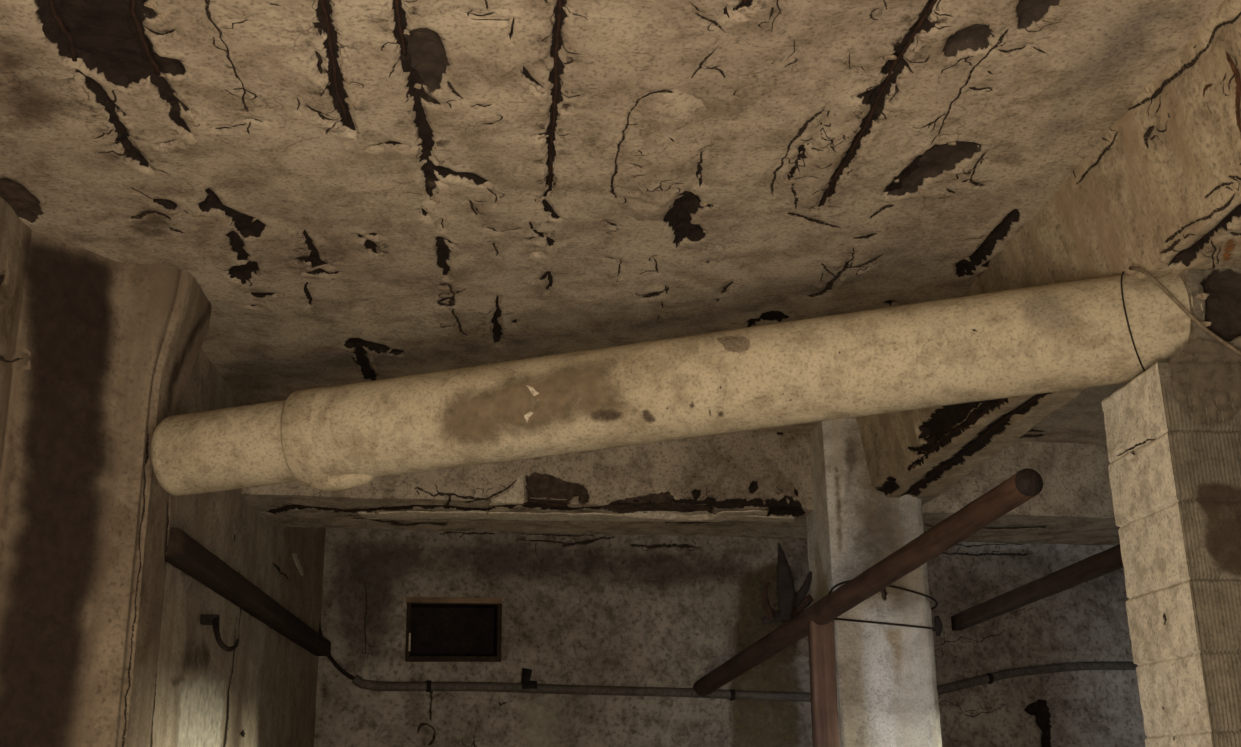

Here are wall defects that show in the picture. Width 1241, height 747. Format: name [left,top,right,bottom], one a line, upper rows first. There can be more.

spalling [35,0,200,176]
spalling [373,0,488,216]
spalling [521,0,587,246]
spalling [808,0,997,212]
crack [1073,12,1241,185]
spalling [663,165,714,247]
crack [1160,163,1241,270]
crack [352,479,712,556]
flaking render [261,467,806,522]
damp [446,365,623,441]
spalling [876,391,1058,496]
damp [1197,484,1241,574]